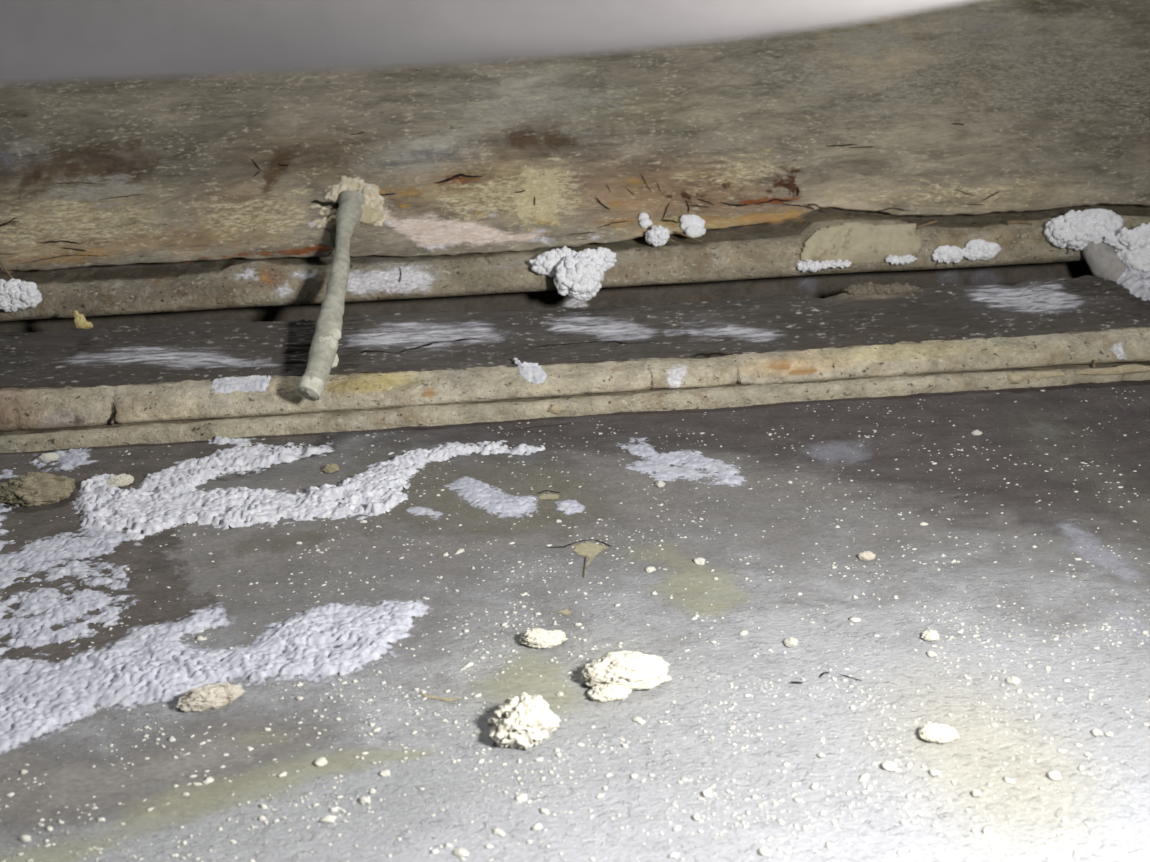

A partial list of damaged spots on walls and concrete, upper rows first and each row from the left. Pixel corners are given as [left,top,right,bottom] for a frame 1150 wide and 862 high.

leakage [205,88,627,251]
rust [705,167,802,223]
leakage [276,270,317,298]
leakage [347,265,435,294]
leakage [1110,341,1127,360]
leakage [0,380,1150,830]